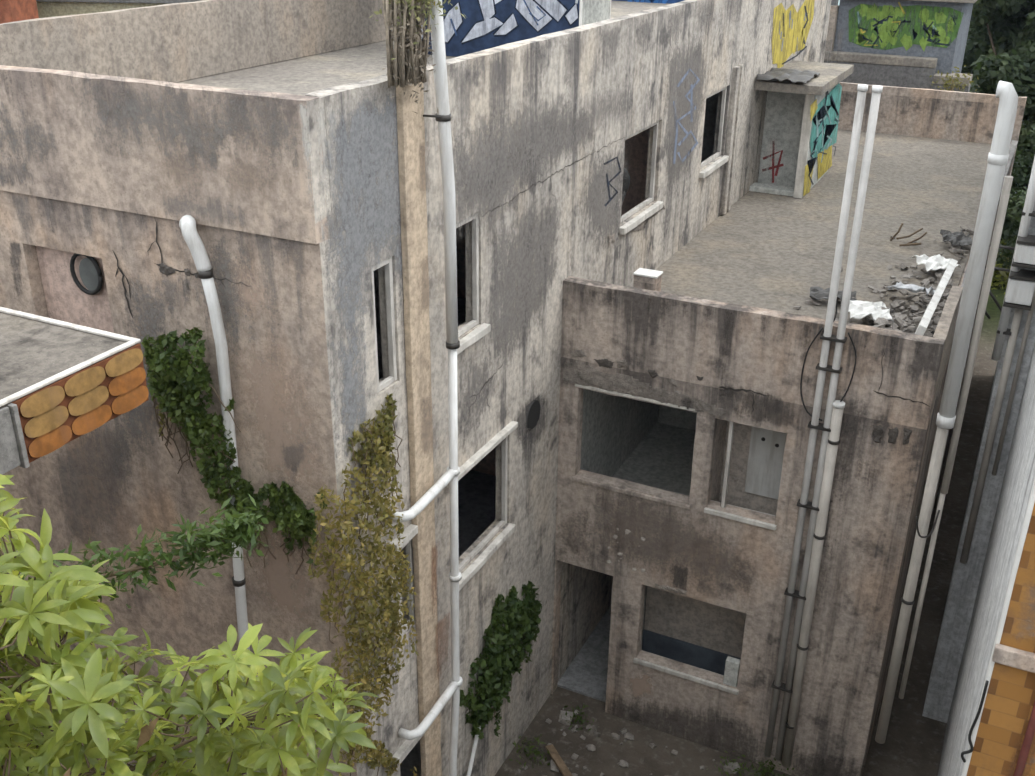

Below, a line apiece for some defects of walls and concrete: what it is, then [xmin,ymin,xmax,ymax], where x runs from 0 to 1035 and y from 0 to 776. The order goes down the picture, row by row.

water stain [300,105,336,194]
crack [113,251,133,318]
crack [147,217,251,290]
water stain [836,397,866,485]
water stain [608,702,764,763]